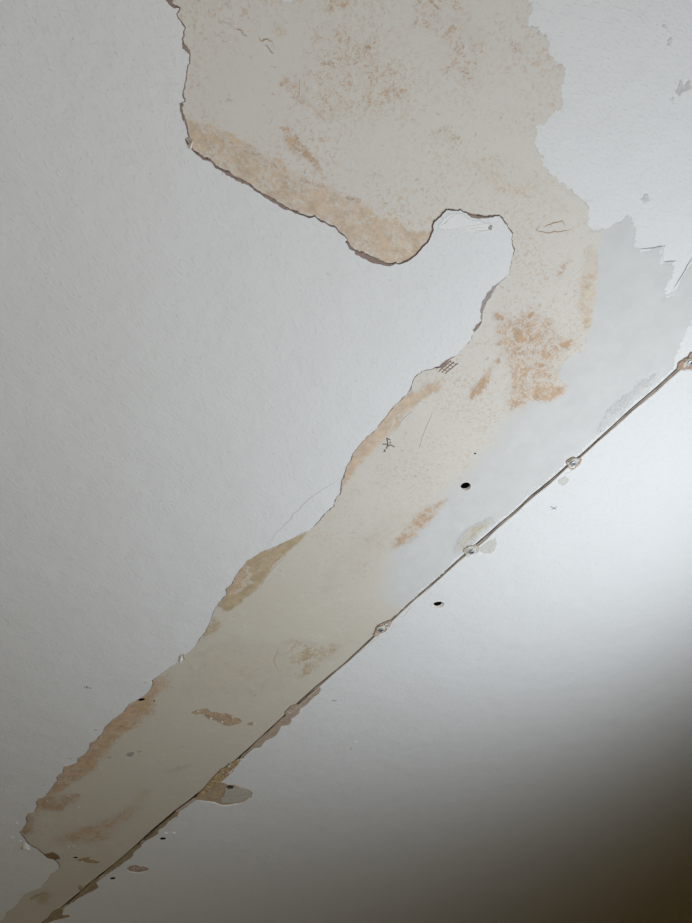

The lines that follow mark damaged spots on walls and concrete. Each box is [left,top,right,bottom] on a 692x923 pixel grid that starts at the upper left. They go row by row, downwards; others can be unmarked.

peeling [186,138,348,240]
leakage [186,114,432,263]
peeling [345,241,395,266]
peeling [394,215,692,601]
crack [62,366,692,909]
spalling [373,619,391,636]
spalling [191,708,242,726]
spalling [195,756,244,799]